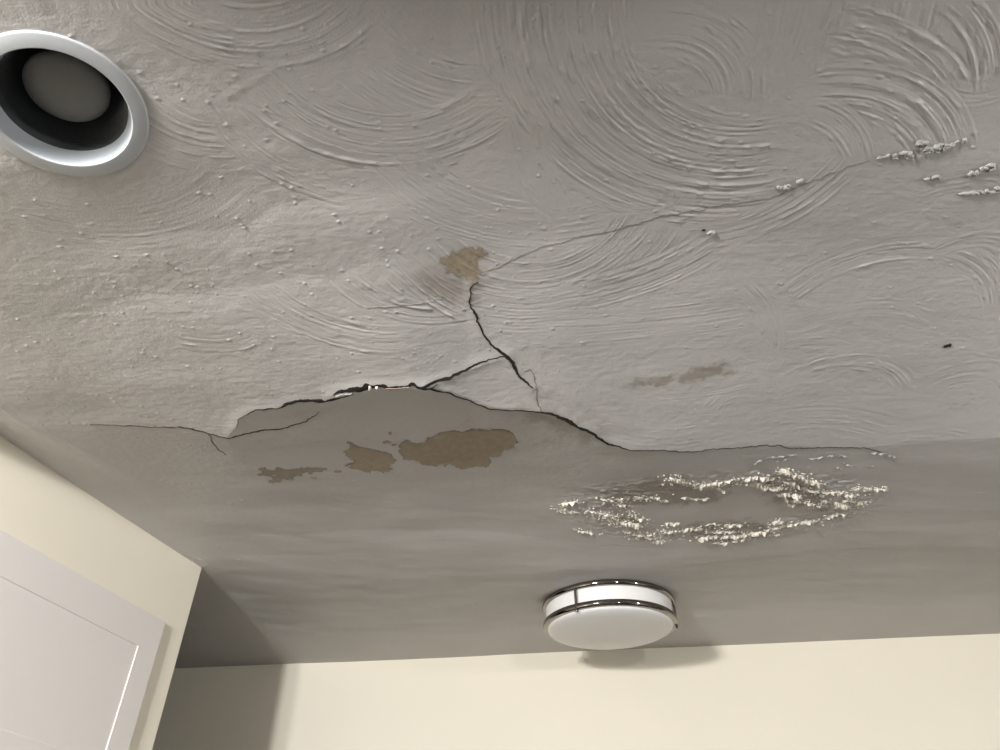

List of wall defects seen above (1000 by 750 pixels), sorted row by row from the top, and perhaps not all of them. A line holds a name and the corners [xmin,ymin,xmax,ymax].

water stain [440,247,488,283]
crack [90,160,883,455]
peeling [258,429,518,483]